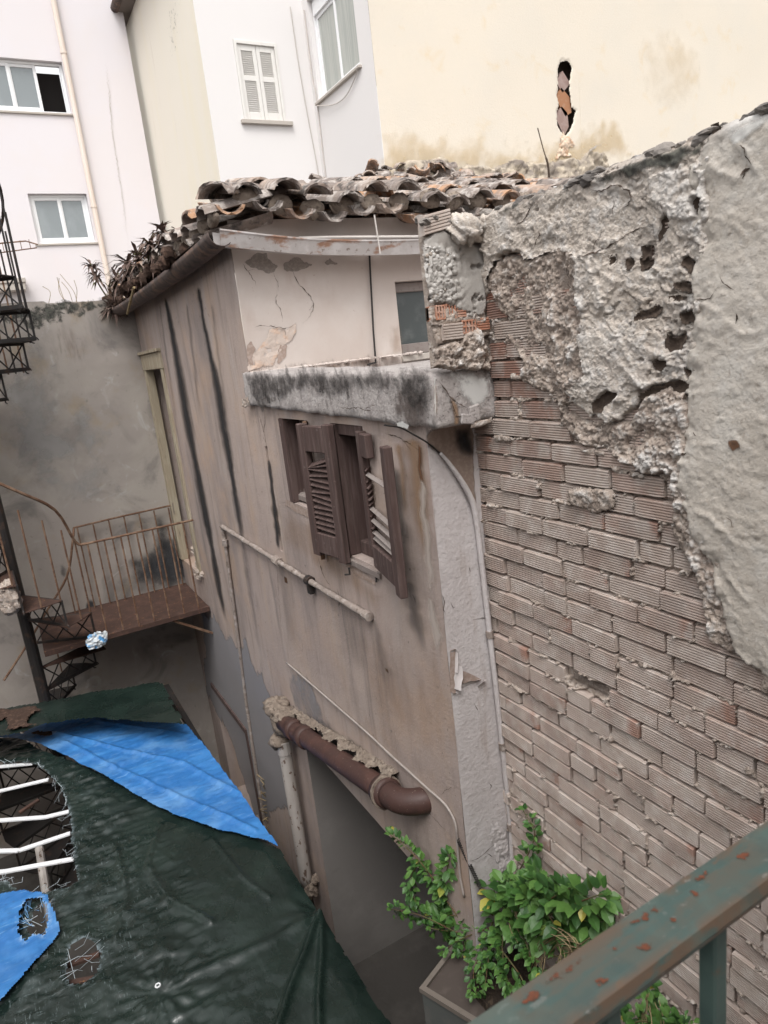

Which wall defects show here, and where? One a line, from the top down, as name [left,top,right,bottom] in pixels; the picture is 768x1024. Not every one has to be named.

spalling [414,214,452,226]
peeling [246,253,312,273]
crack [244,266,314,334]
spalling [425,255,457,321]
flaking render [247,324,296,371]
leakage [198,289,242,533]
leakage [248,362,436,430]
leakage [165,300,224,608]
peeling [427,417,492,501]
flaking render [487,248,736,655]
peeling [450,649,486,696]
corrosion [521,958,581,1004]